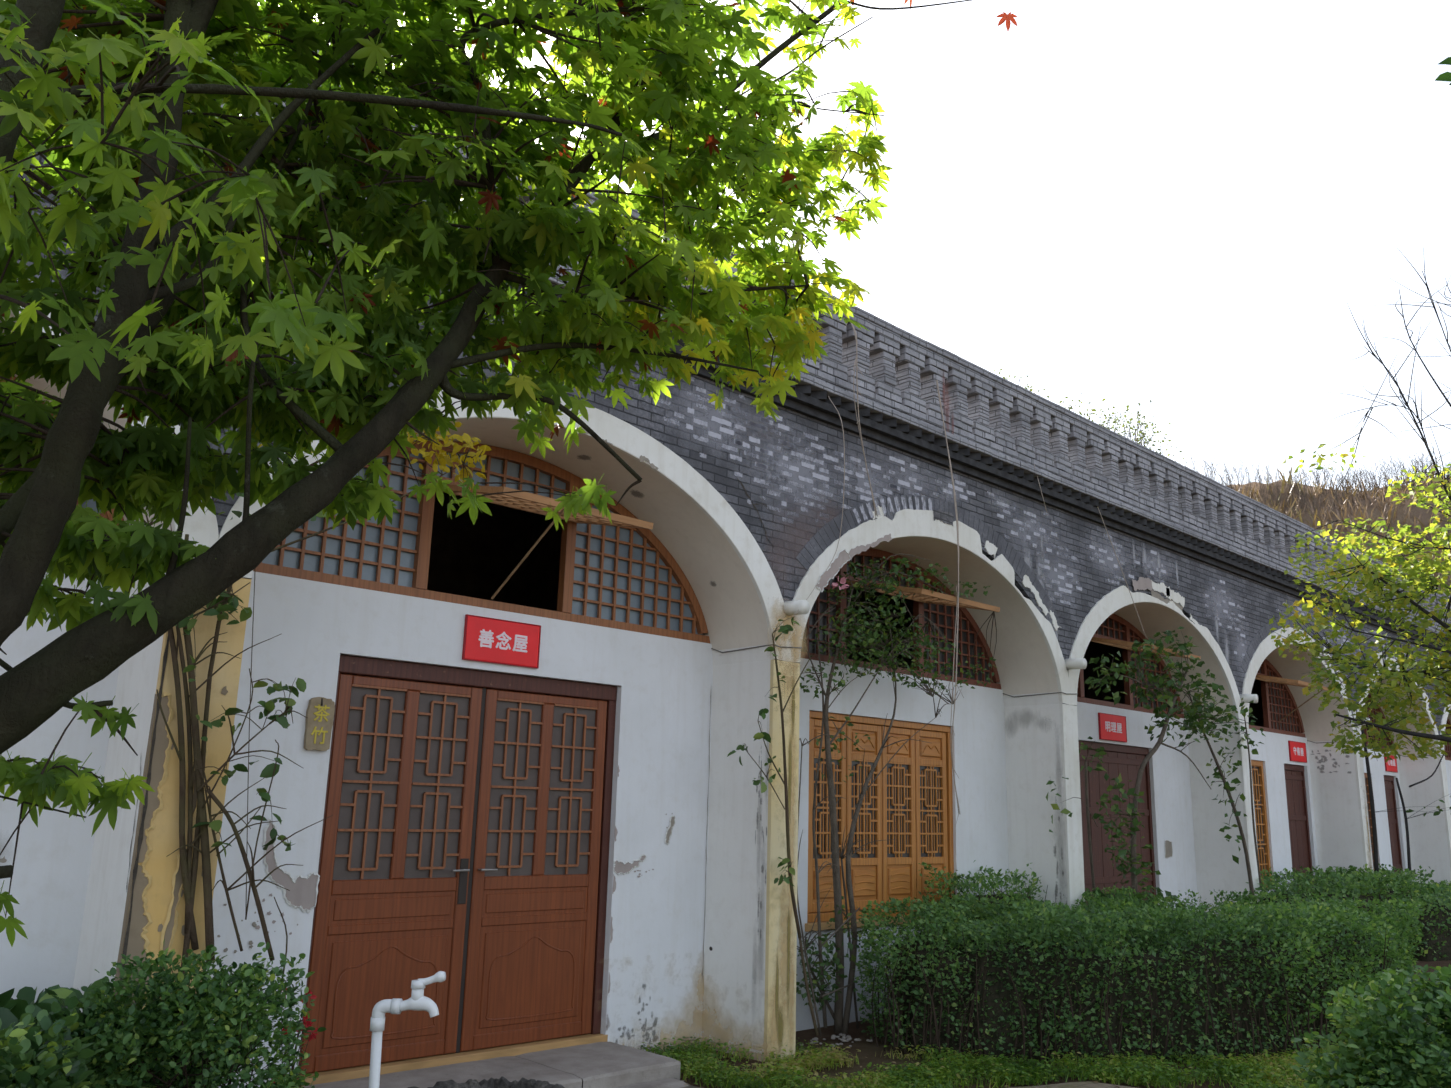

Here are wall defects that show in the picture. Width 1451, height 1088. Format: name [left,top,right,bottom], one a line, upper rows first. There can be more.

flaking render [933,509,954,526]
flaking render [816,534,892,592]
flaking render [984,541,998,559]
flaking render [1022,575,1061,631]
peeling [114,692,187,1018]
flaking render [217,818,320,953]
flaking render [612,854,654,894]